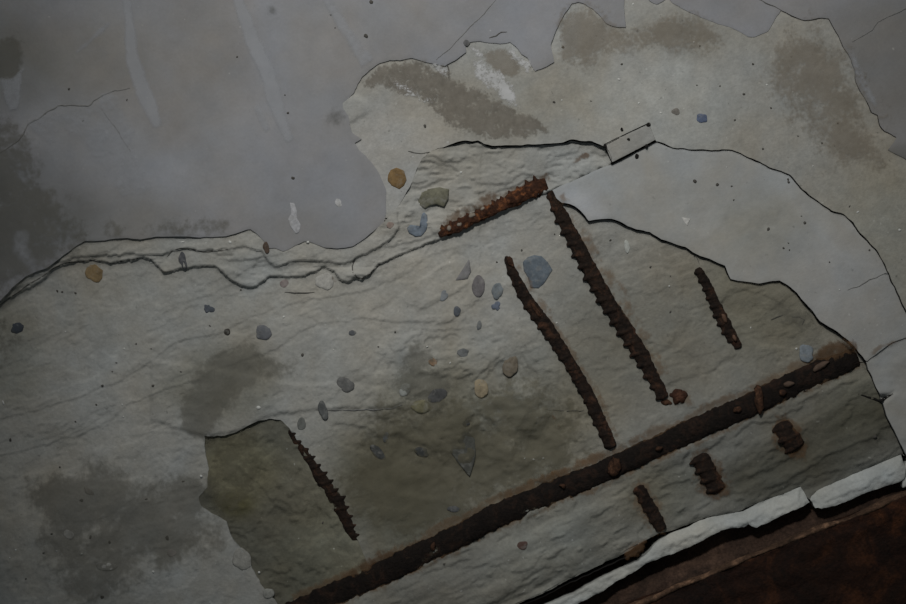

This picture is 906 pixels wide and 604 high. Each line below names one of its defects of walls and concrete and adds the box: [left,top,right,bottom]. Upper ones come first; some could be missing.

crack [0,88,131,153]
water stain [366,48,546,138]
peeling [343,0,906,311]
spalling [0,141,906,604]
rust [630,490,906,604]